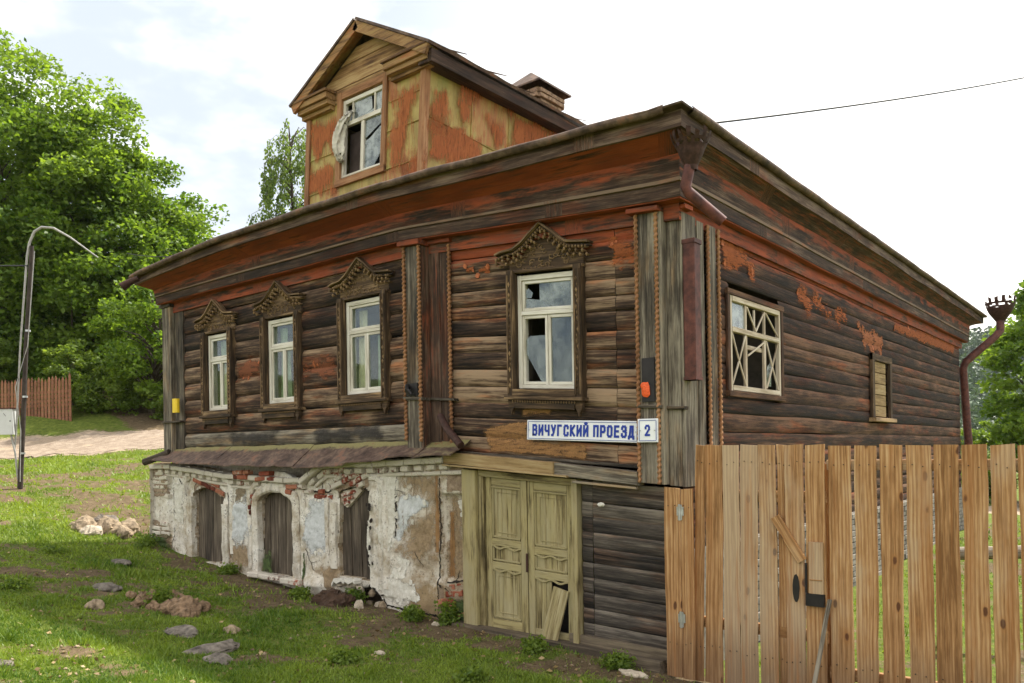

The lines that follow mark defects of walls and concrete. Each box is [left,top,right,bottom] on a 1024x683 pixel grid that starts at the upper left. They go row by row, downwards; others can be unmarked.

peeling [720,240,755,283]
peeling [796,283,883,356]
flaking render [149,469,297,545]
flaking render [302,468,428,606]
flaking render [446,467,462,517]
spalling [437,583,464,617]